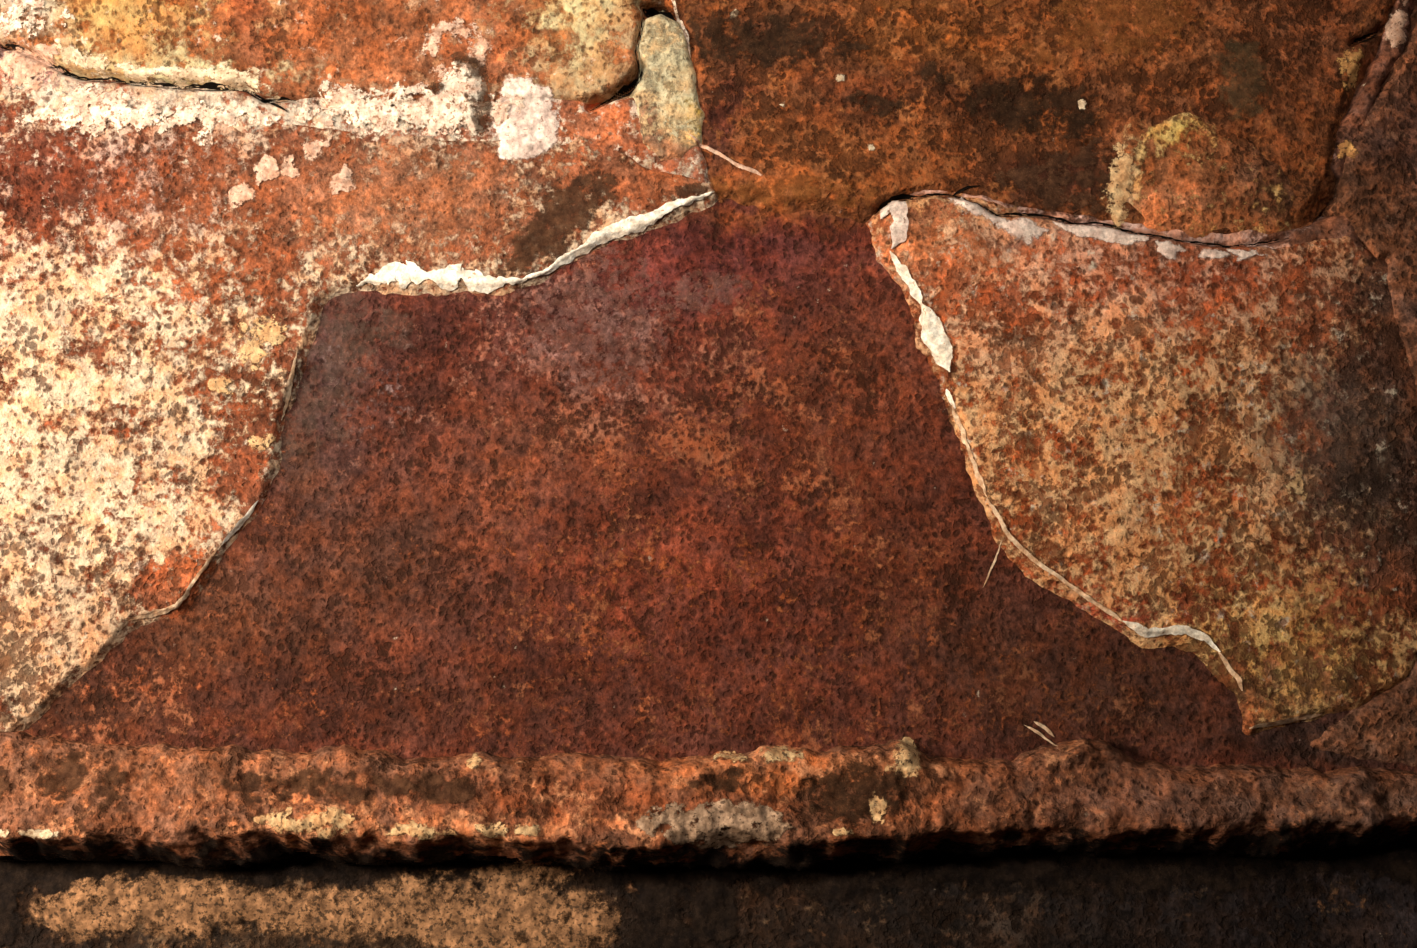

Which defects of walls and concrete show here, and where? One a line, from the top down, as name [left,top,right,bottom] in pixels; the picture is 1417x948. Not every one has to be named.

crack [1349,32,1377,46]
crack [0,44,296,112]
spalling [24,191,1417,772]